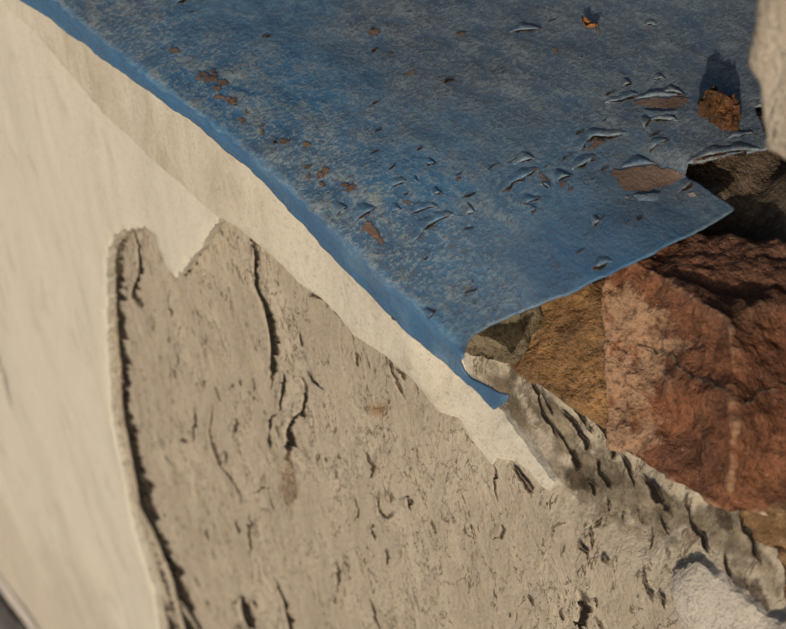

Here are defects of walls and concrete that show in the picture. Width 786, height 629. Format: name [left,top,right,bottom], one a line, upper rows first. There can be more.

peeling [195,69,248,124]
peeling [633,89,689,117]
peeling [304,164,330,187]
peeling [609,154,686,202]
peeling [362,221,385,249]
crack [243,234,324,464]
crack [111,227,210,629]
crack [179,388,274,555]
crack [351,450,412,565]
crack [524,381,762,609]
crack [230,596,258,629]
crack [558,584,603,629]